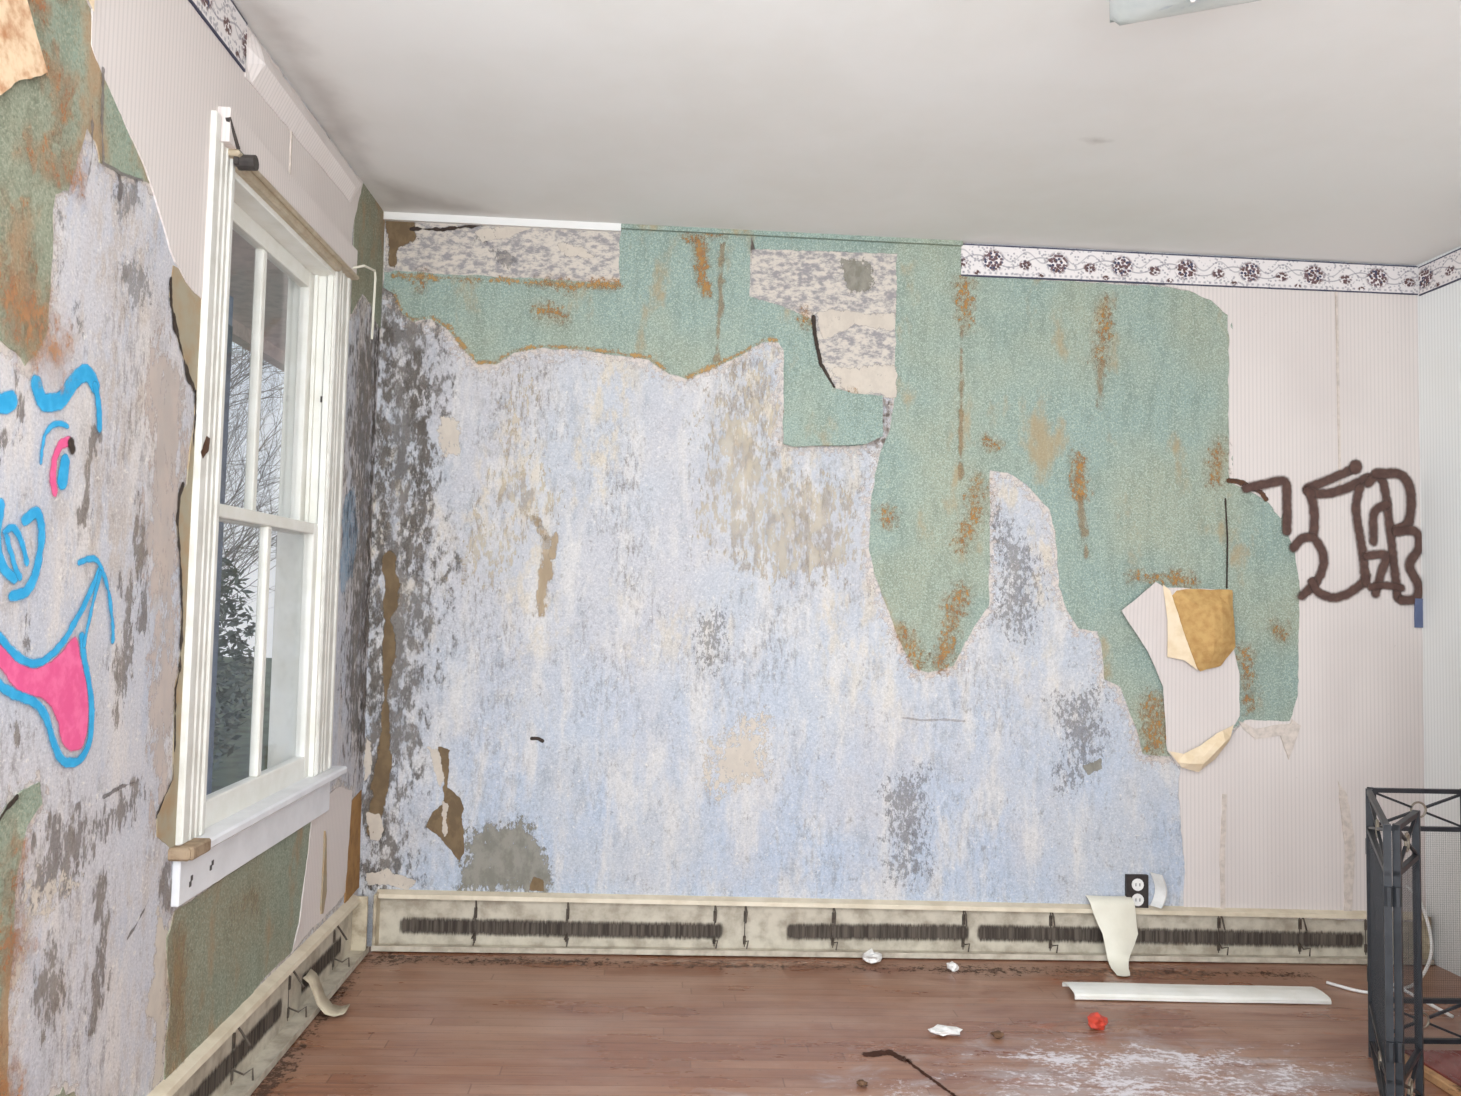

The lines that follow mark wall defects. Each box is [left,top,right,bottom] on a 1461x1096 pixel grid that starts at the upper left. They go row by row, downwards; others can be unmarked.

flaking render [385,221,621,282]
flaking render [751,249,898,398]
corrosion [951,275,975,333]
corrosion [949,475,989,554]
corrosion [1069,452,1093,501]
peeling [138,324,210,840]
damp [340,283,461,906]
corrosion [895,584,971,674]
corrosion [1123,569,1196,589]
peeling [426,746,464,861]
damp [457,815,554,893]
peeling [145,861,173,1088]